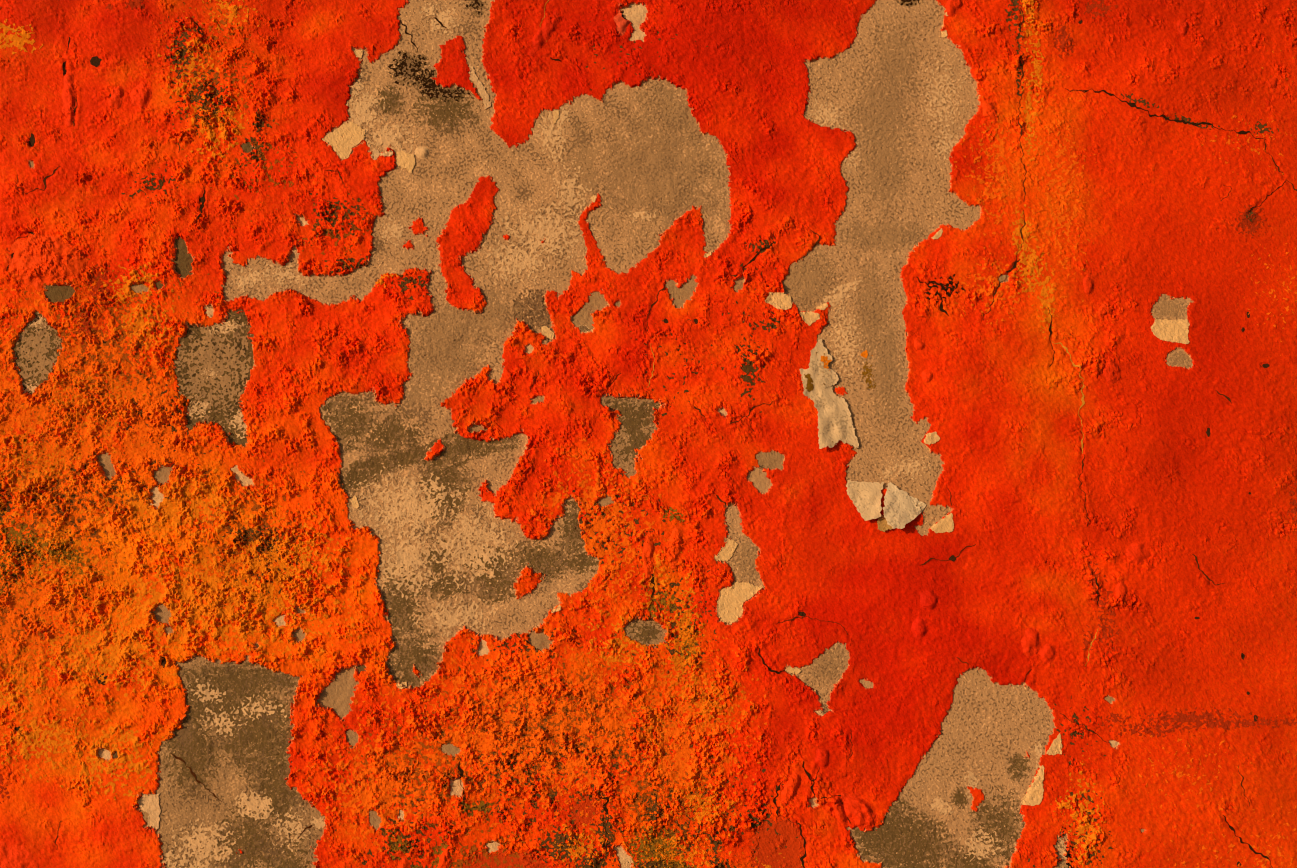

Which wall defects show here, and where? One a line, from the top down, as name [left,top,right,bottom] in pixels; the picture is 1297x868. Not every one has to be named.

crack [1065,88,1297,213]
peeling [765,0,980,536]
peeling [13,279,76,394]
peeling [173,0,731,689]
peeling [1151,294,1193,368]
peeling [715,505,765,625]
peeling [137,644,326,868]
peeling [317,665,366,748]
peeling [369,811,382,831]
peeling [614,846,633,868]
peeling [846,667,1062,868]
crack [1223,766,1273,868]